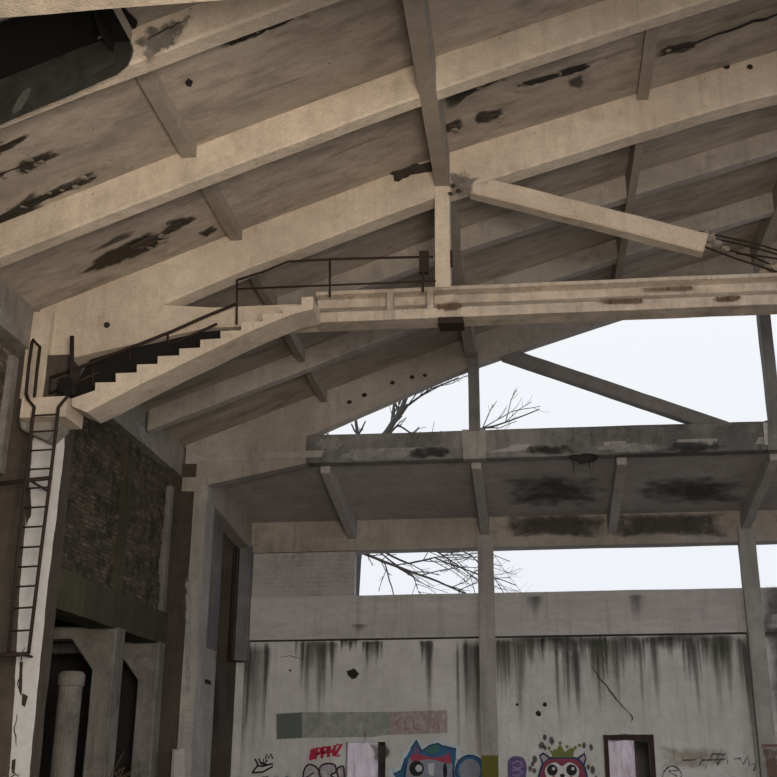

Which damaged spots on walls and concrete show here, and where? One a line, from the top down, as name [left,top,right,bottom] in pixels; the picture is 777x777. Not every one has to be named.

spalling [136,16,190,61]
spalling [0,136,26,156]
spalling [0,152,59,179]
spalling [390,162,432,182]
spalling [0,173,97,222]
spalling [125,217,195,251]
leakage [511,516,600,536]
leakage [766,595,777,665]
leakage [296,640,353,672]
leakage [457,643,480,676]
leakage [496,635,749,684]
crack [591,665,633,721]